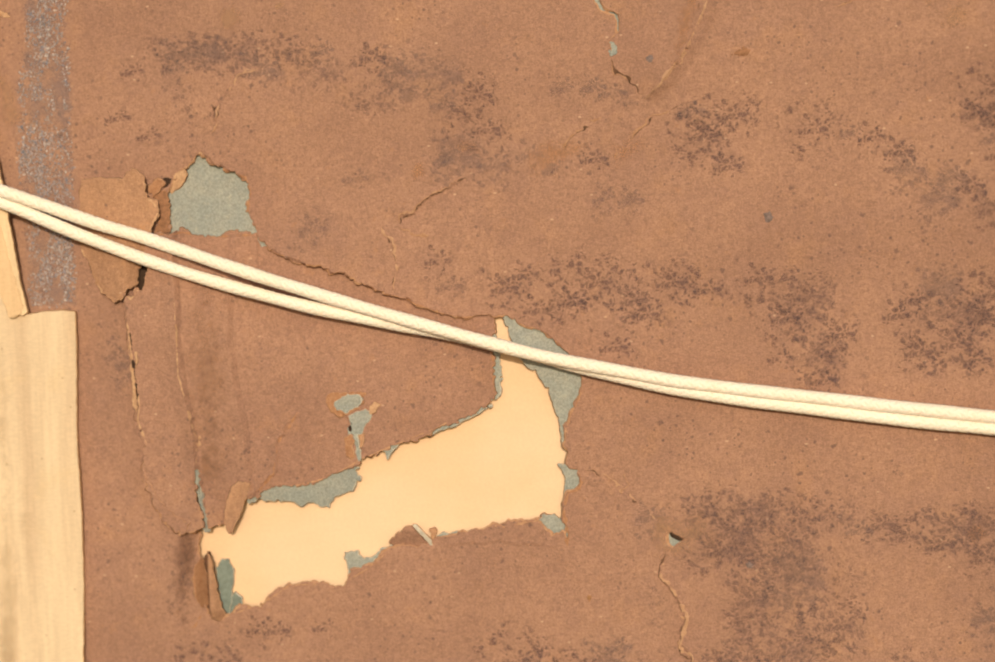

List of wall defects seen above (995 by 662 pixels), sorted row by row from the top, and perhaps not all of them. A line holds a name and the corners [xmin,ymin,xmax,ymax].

crack [595,0,708,158]
peeling [75,152,583,628]
crack [579,469,694,662]